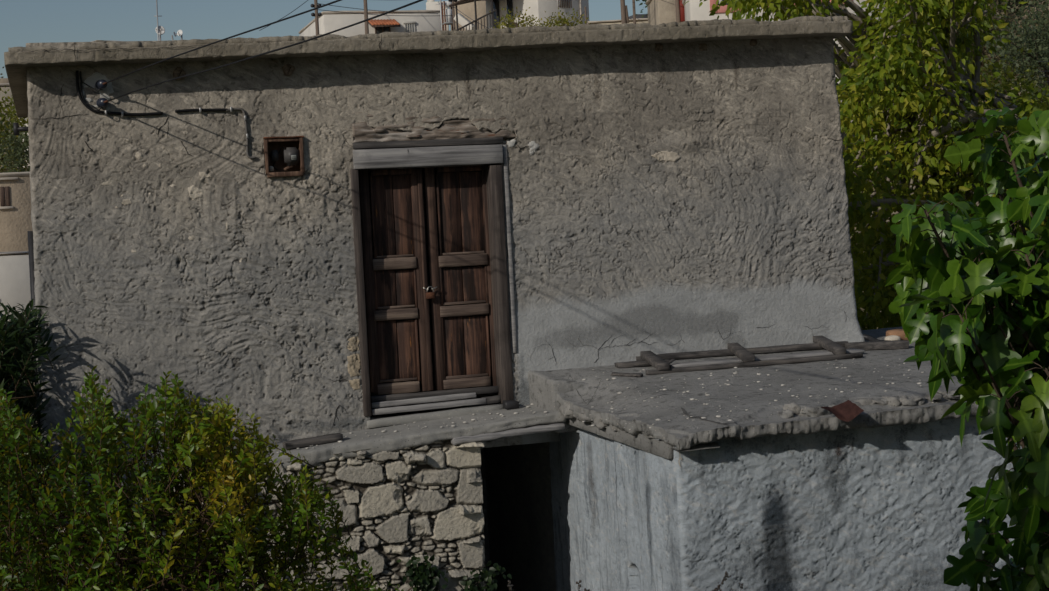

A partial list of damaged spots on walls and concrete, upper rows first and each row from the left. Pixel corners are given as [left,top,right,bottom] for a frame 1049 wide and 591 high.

flaking render [368,115,539,155]
crack [530,332,685,404]
rust [821,400,864,422]
damp [762,497,792,591]